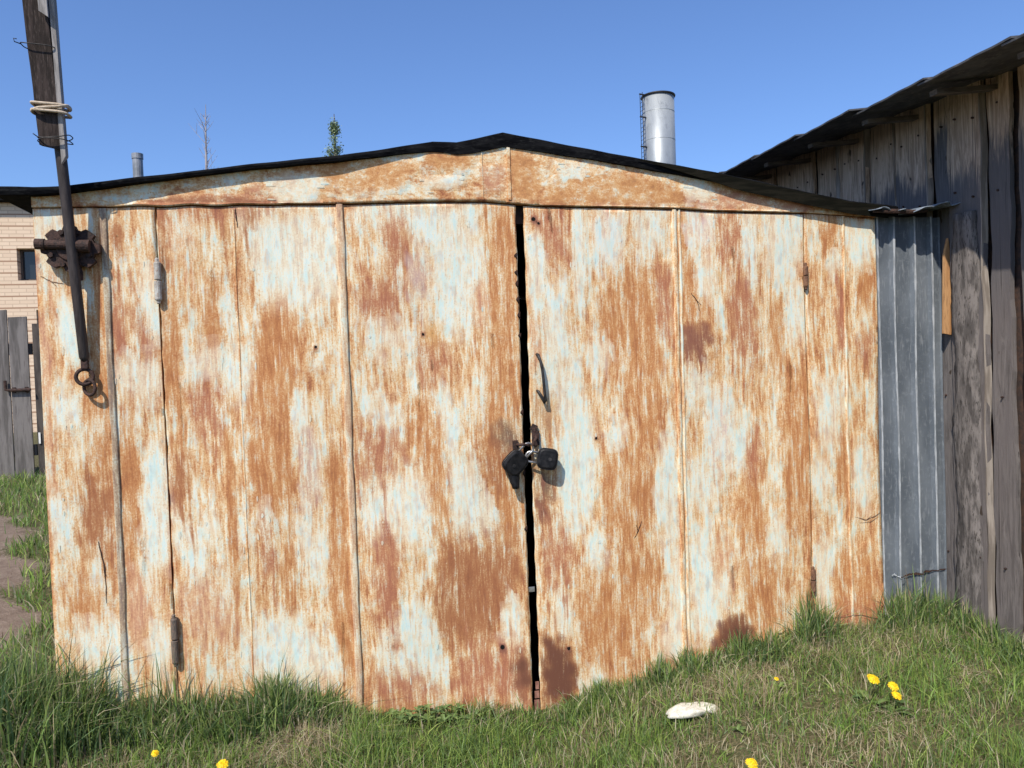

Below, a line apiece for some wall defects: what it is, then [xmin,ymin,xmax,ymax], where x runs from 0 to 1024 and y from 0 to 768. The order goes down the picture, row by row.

crack [98,541,107,603]
corrosion [38,147,884,715]